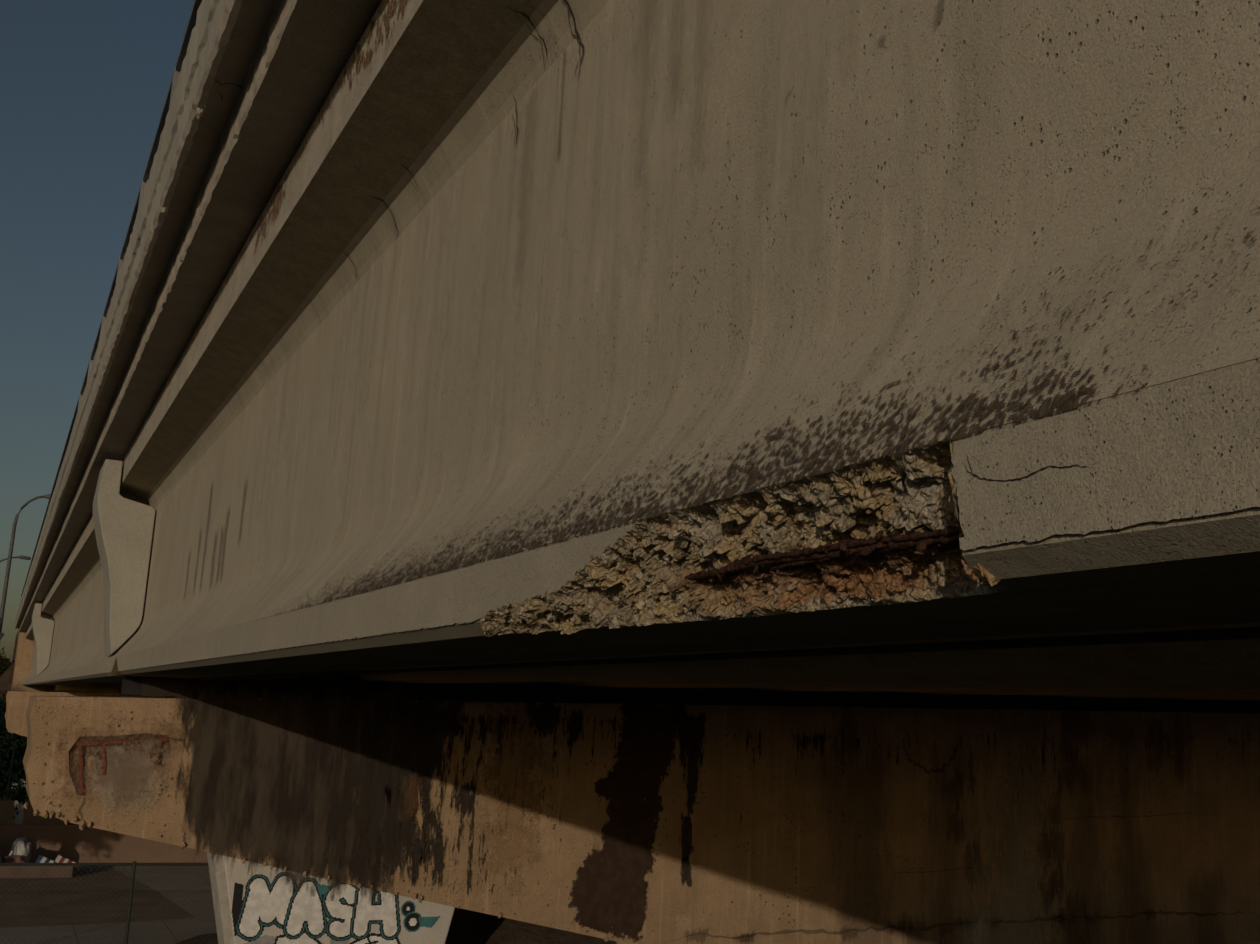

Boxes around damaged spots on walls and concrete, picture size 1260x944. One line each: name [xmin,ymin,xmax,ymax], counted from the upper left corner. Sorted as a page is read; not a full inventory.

crack [511,96,519,146]
crack [509,0,584,80]
spalling [480,440,1010,637]
leakage [270,190,1260,615]
crack [962,457,1089,482]
leakage [172,672,761,943]